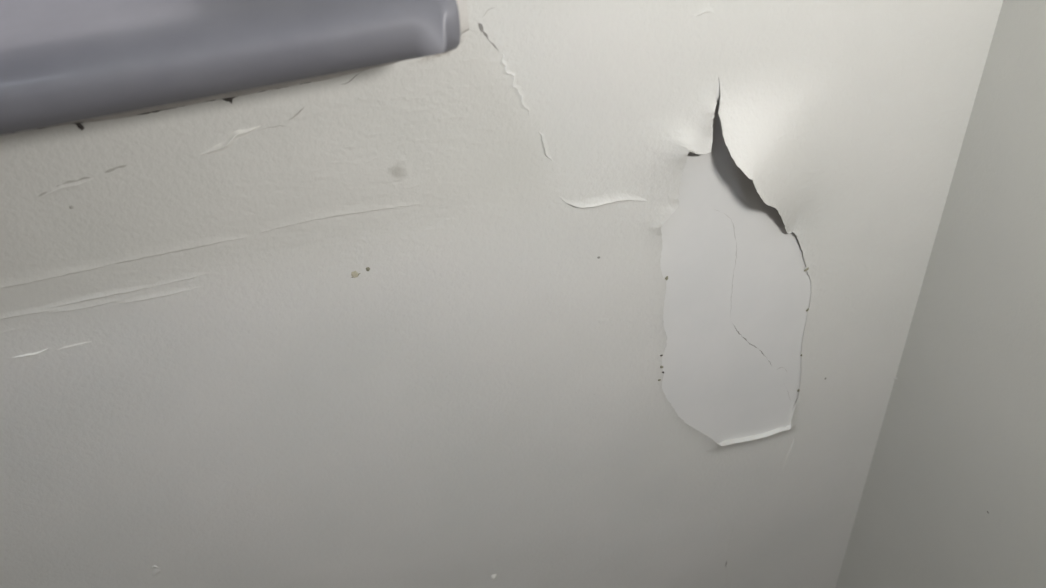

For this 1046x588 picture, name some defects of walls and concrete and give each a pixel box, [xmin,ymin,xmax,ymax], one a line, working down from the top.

peeling [534,60,917,508]